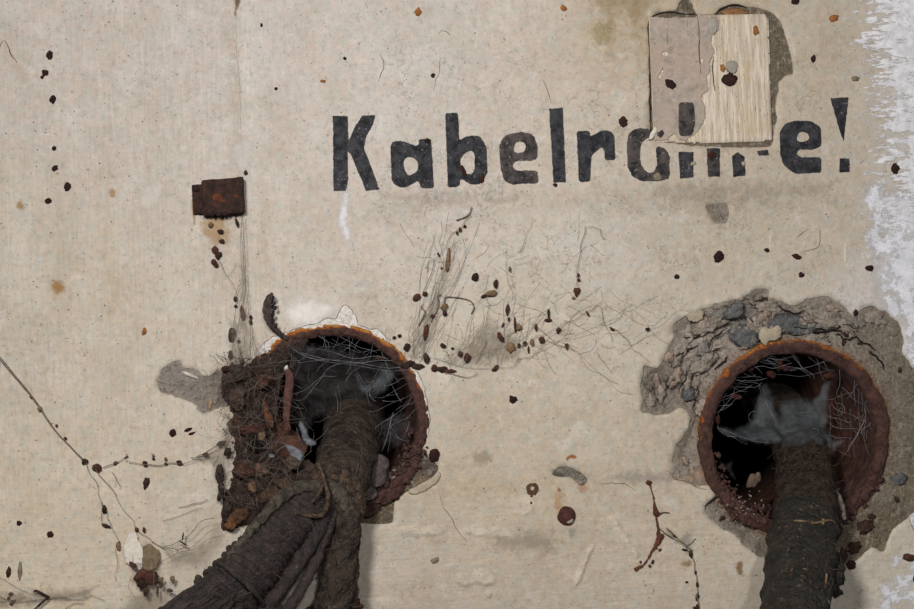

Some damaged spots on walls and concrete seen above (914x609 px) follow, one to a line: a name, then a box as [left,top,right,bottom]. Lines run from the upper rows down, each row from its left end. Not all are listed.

spalling [647,0,793,148]
corrosion [204,216,228,244]
corrosion [283,365,294,431]
spalling [640,178,914,565]